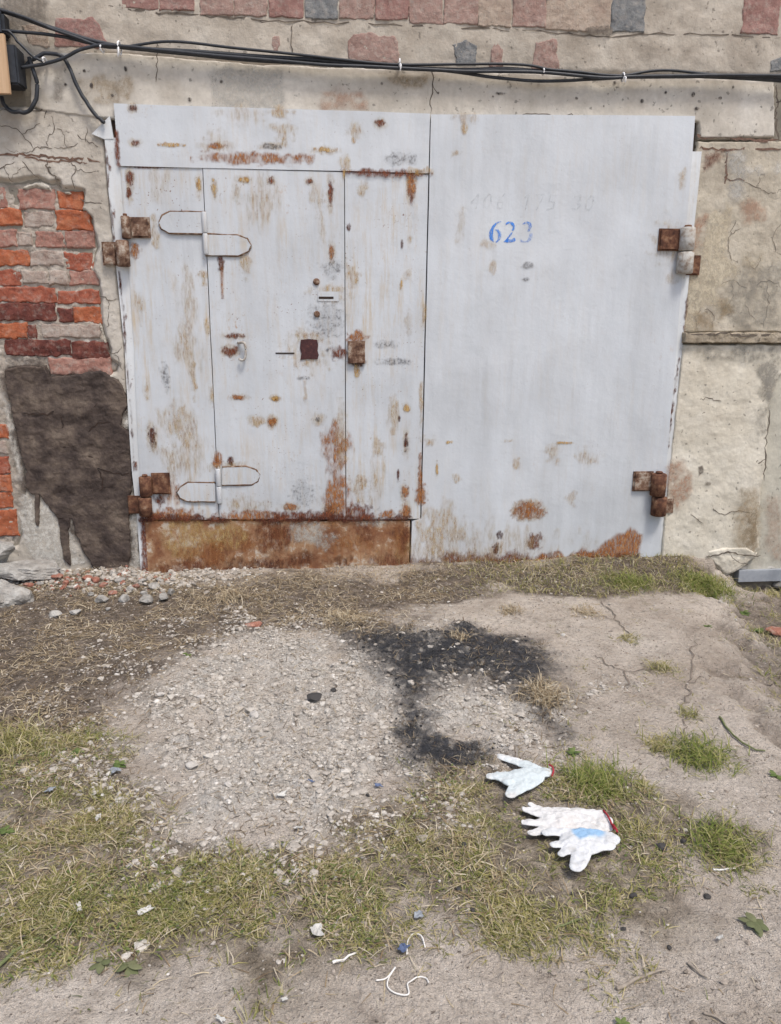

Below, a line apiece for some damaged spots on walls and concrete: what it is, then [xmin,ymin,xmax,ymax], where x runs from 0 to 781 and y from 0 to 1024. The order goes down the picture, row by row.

crack [0,109,102,204]
corrosion [157,108,330,164]
corrosion [343,159,433,203]
crack [687,220,781,337]
flaking render [0,181,128,567]
water stain [0,360,133,569]
corrosion [138,421,642,572]
crack [756,410,770,478]